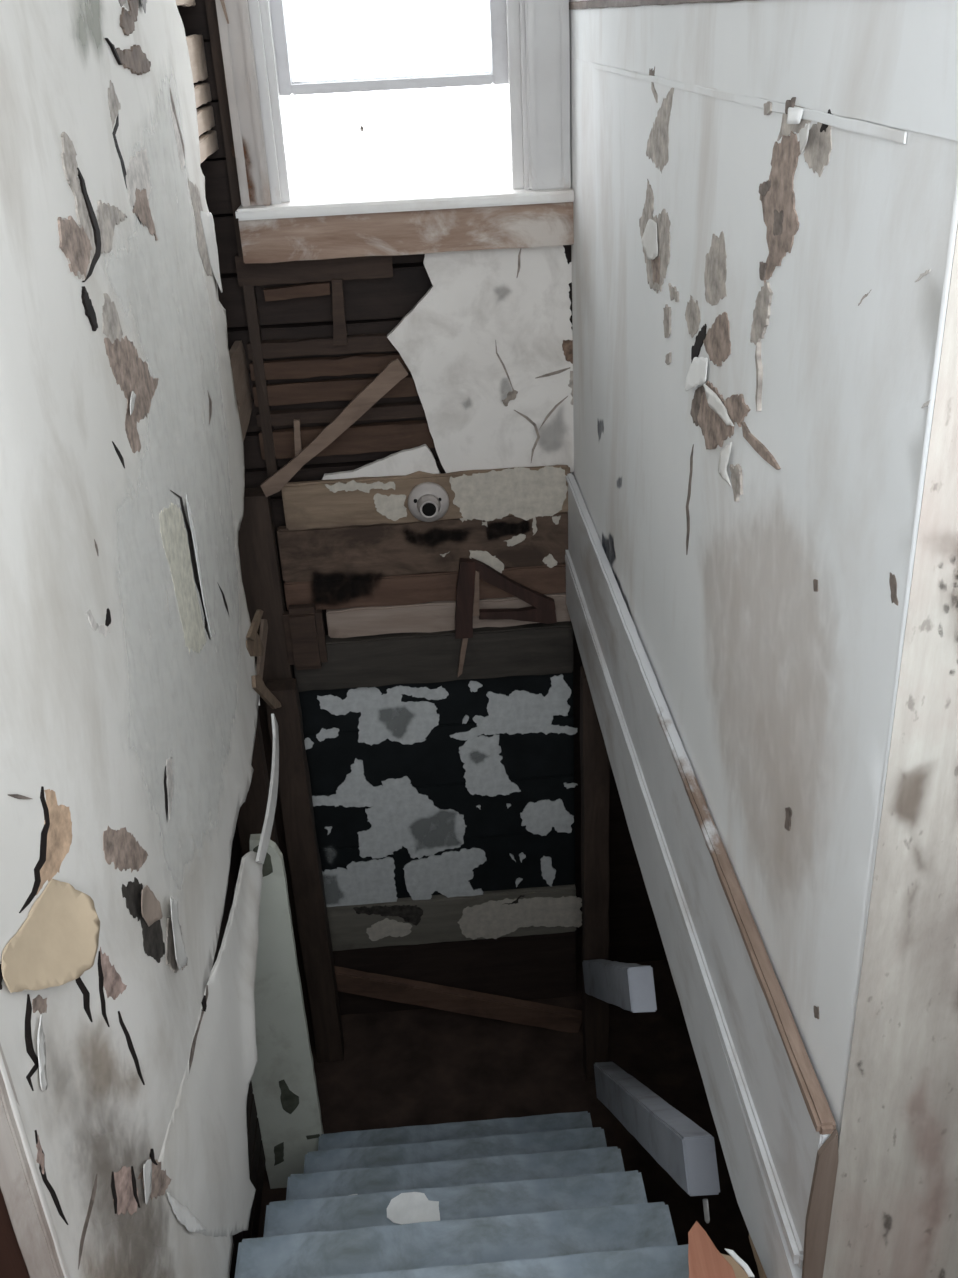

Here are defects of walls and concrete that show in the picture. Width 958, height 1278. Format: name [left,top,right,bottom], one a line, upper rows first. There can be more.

peeling [104,0,151,75]
peeling [57,80,159,454]
peeling [639,67,833,502]
crack [159,490,229,654]
peeling [325,480,407,521]
peeling [449,466,568,546]
peeling [0,786,145,1085]
peeling [103,825,188,973]
peeling [304,685,449,750]
peeling [312,758,582,941]
peeling [450,674,578,836]
water stain [897,775,924,821]